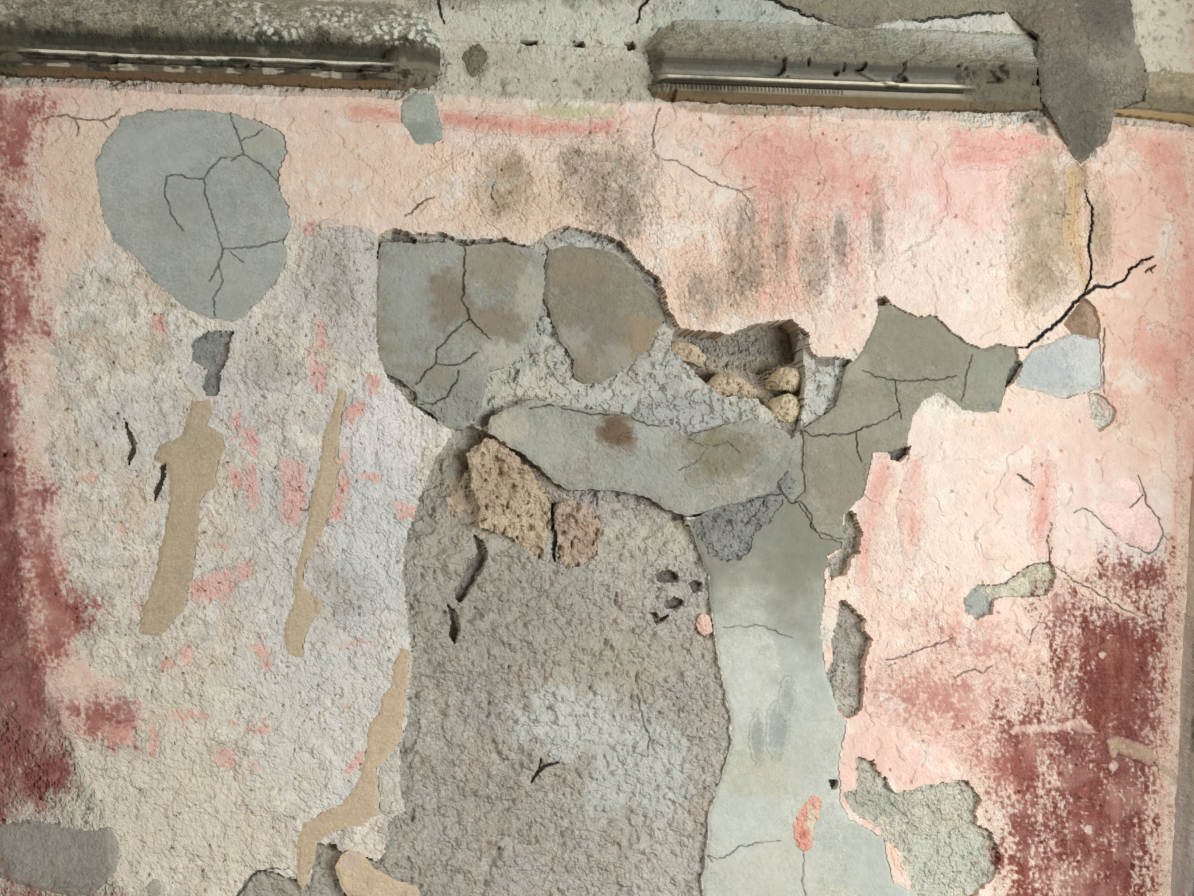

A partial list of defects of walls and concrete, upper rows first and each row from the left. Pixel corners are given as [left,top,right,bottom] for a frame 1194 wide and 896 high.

crack [774,0,824,22]
crack [164,114,284,317]
crack [1018,190,1156,348]
spalling [191,331,234,396]
peeling [341,372,437,429]
crack [803,355,972,460]
peeling [223,407,311,532]
spalling [366,229,849,896]
spalling [827,512,856,577]
spalling [826,601,870,718]
spalling [843,478,1189,896]
spalling [236,843,347,896]